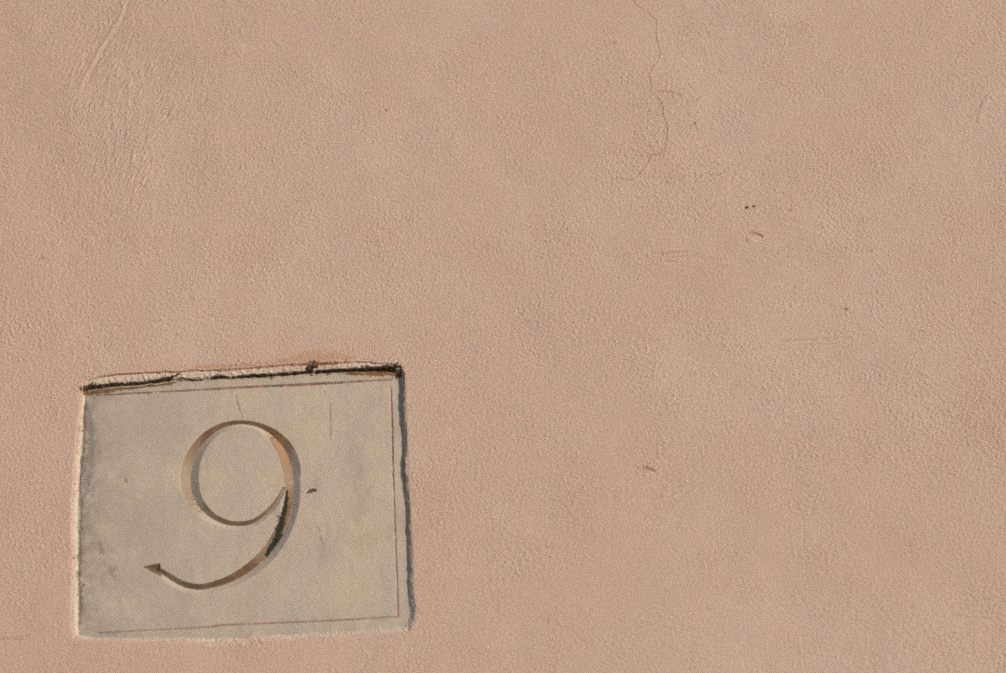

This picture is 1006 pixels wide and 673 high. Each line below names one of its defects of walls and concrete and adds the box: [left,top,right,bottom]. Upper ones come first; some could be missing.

crack [617,0,726,184]